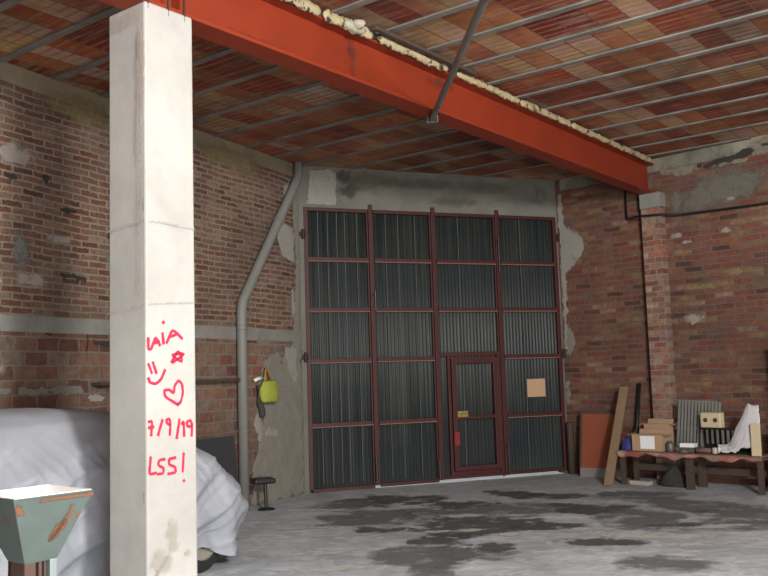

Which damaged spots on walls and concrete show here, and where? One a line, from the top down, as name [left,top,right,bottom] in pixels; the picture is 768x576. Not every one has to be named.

spalling [671,137,768,177]
peeling [285,344,297,383]
peeling [253,408,278,442]